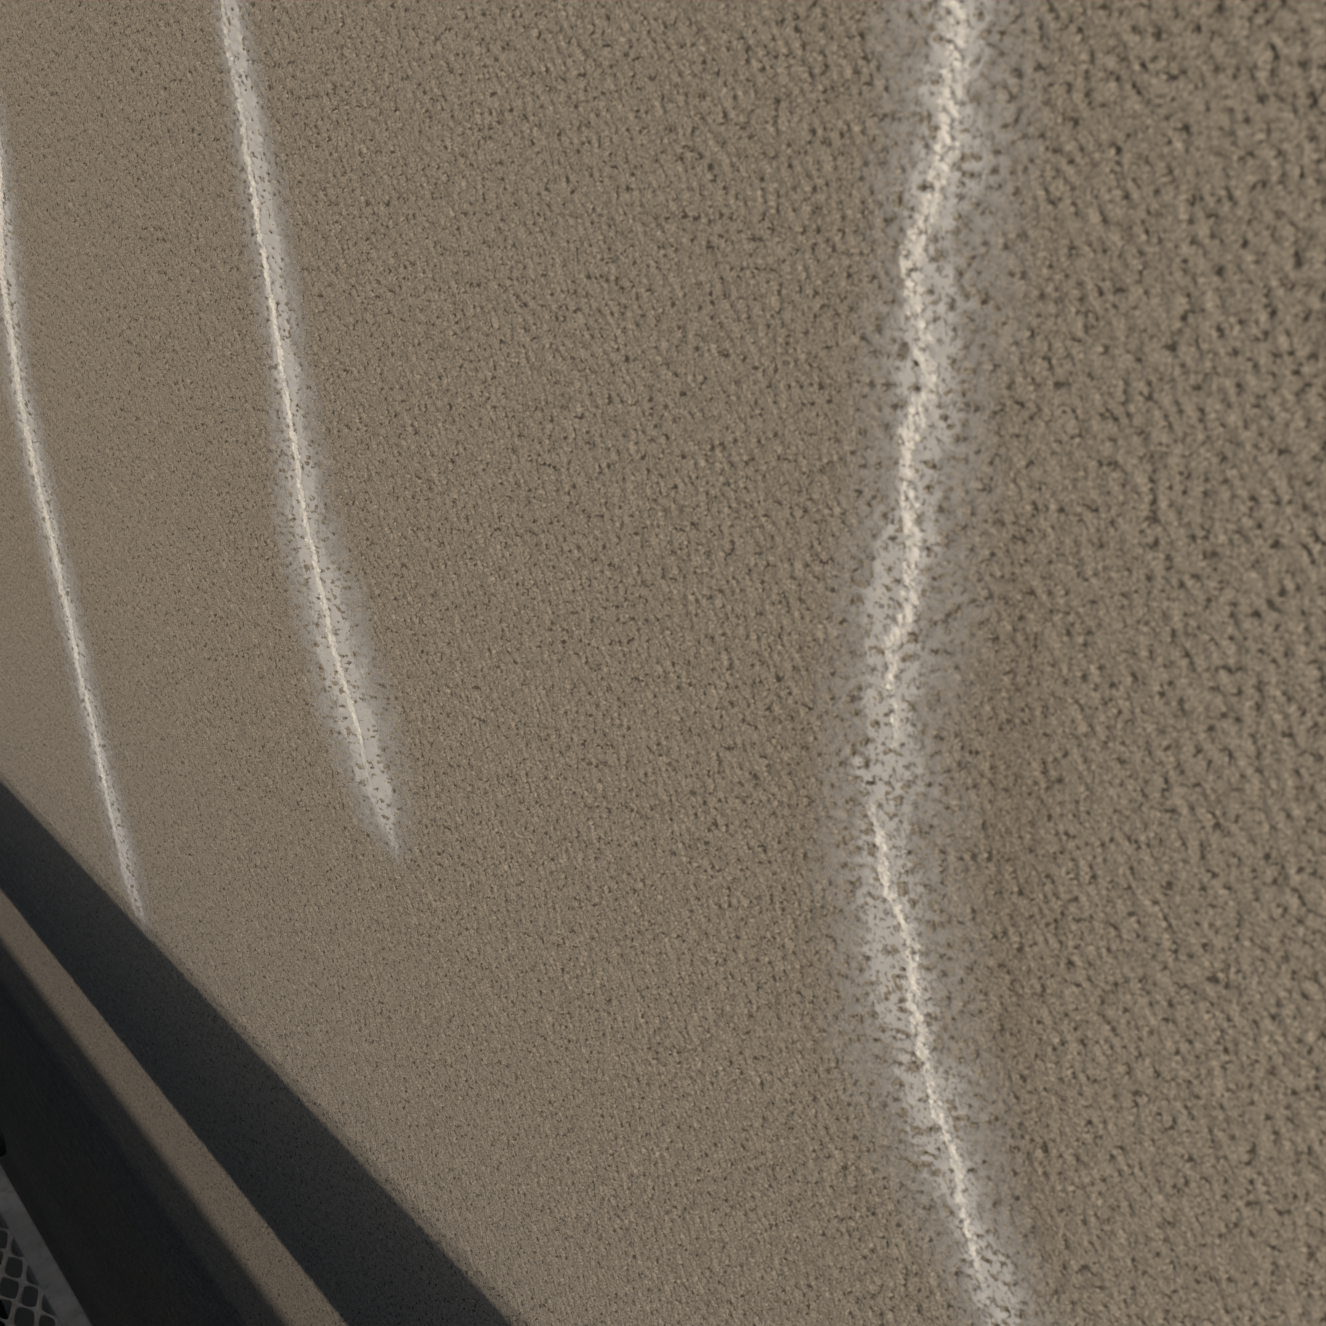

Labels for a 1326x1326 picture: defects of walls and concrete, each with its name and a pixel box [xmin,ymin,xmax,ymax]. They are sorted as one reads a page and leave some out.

crack [0,125,145,924]
crack [219,0,399,853]
crack [846,0,1028,1326]